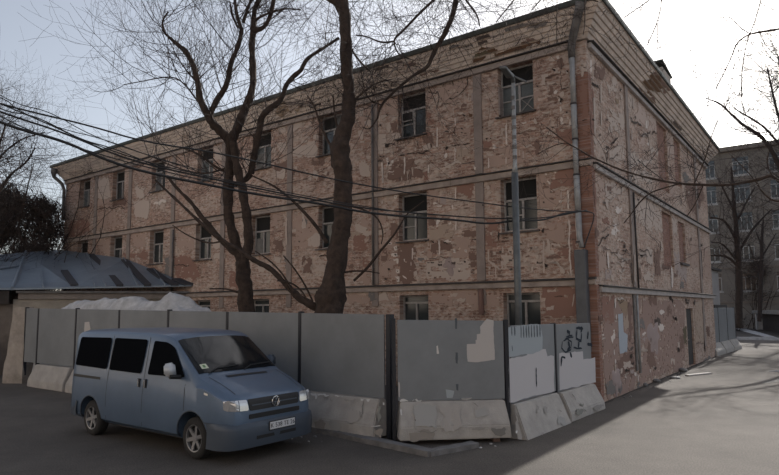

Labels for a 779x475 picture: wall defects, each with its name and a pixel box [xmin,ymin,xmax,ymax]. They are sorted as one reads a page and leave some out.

spalling [425,240,477,279]
spalling [616,303,635,378]